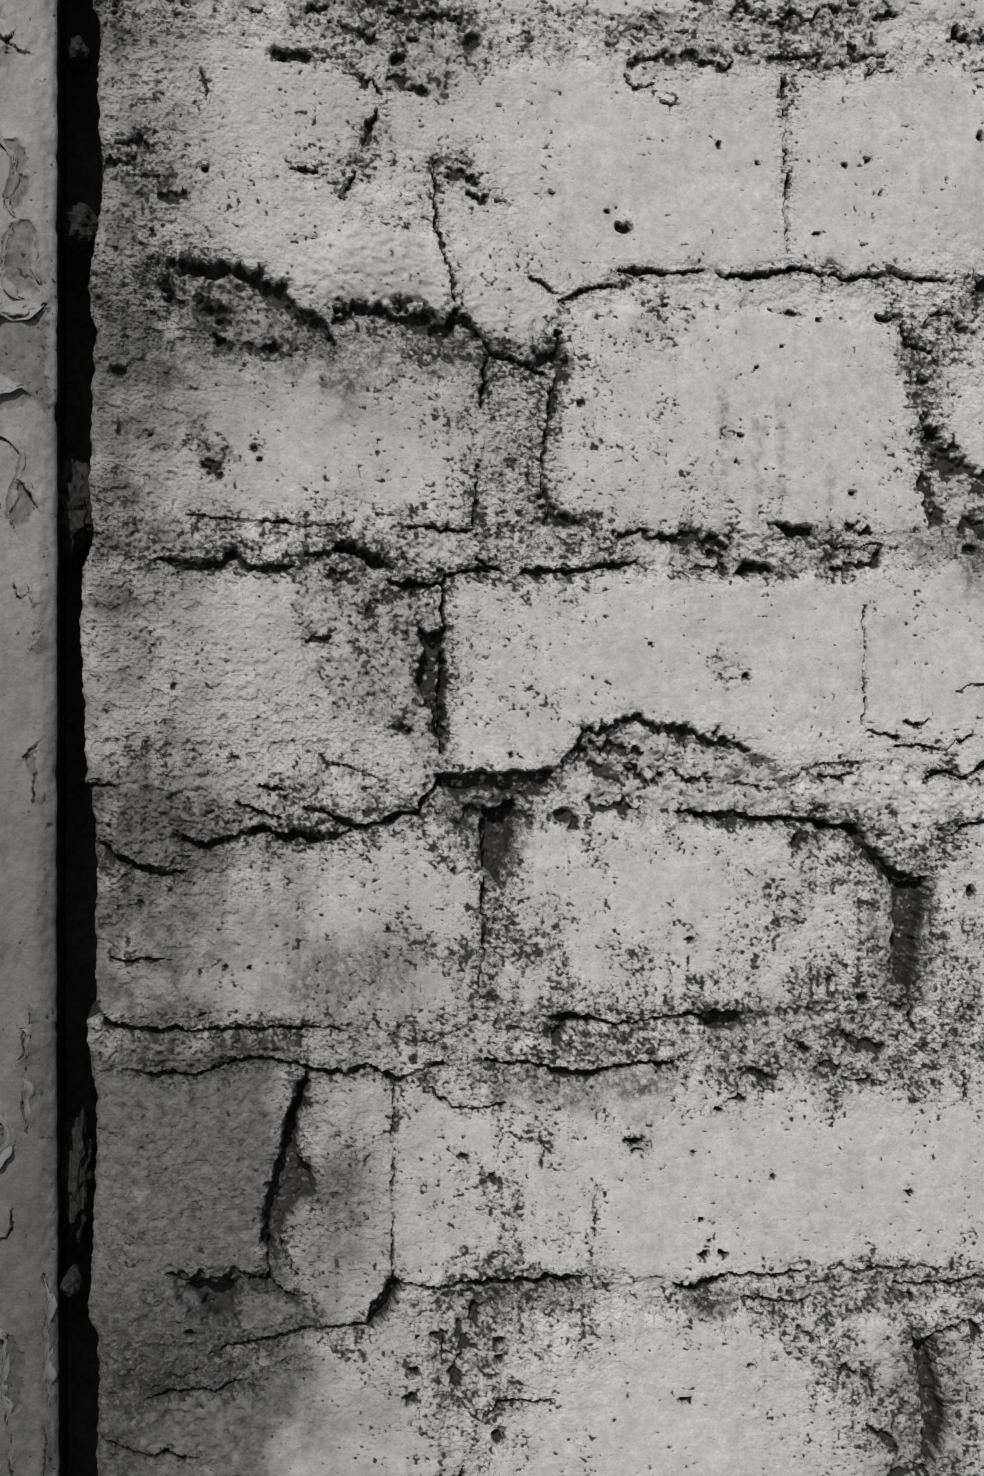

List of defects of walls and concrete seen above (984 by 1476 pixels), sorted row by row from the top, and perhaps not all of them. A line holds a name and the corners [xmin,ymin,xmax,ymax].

peeling [0,133,53,533]
crack [289,108,380,199]
crack [431,158,552,492]
crack [527,77,949,363]
spalling [594,0,901,113]
peeling [17,737,43,809]
crack [99,463,637,884]
spalling [291,539,856,891]
crack [674,604,984,887]
peeling [0,1000,37,1168]
crack [96,1011,702,1292]
peeling [40,1264,82,1417]